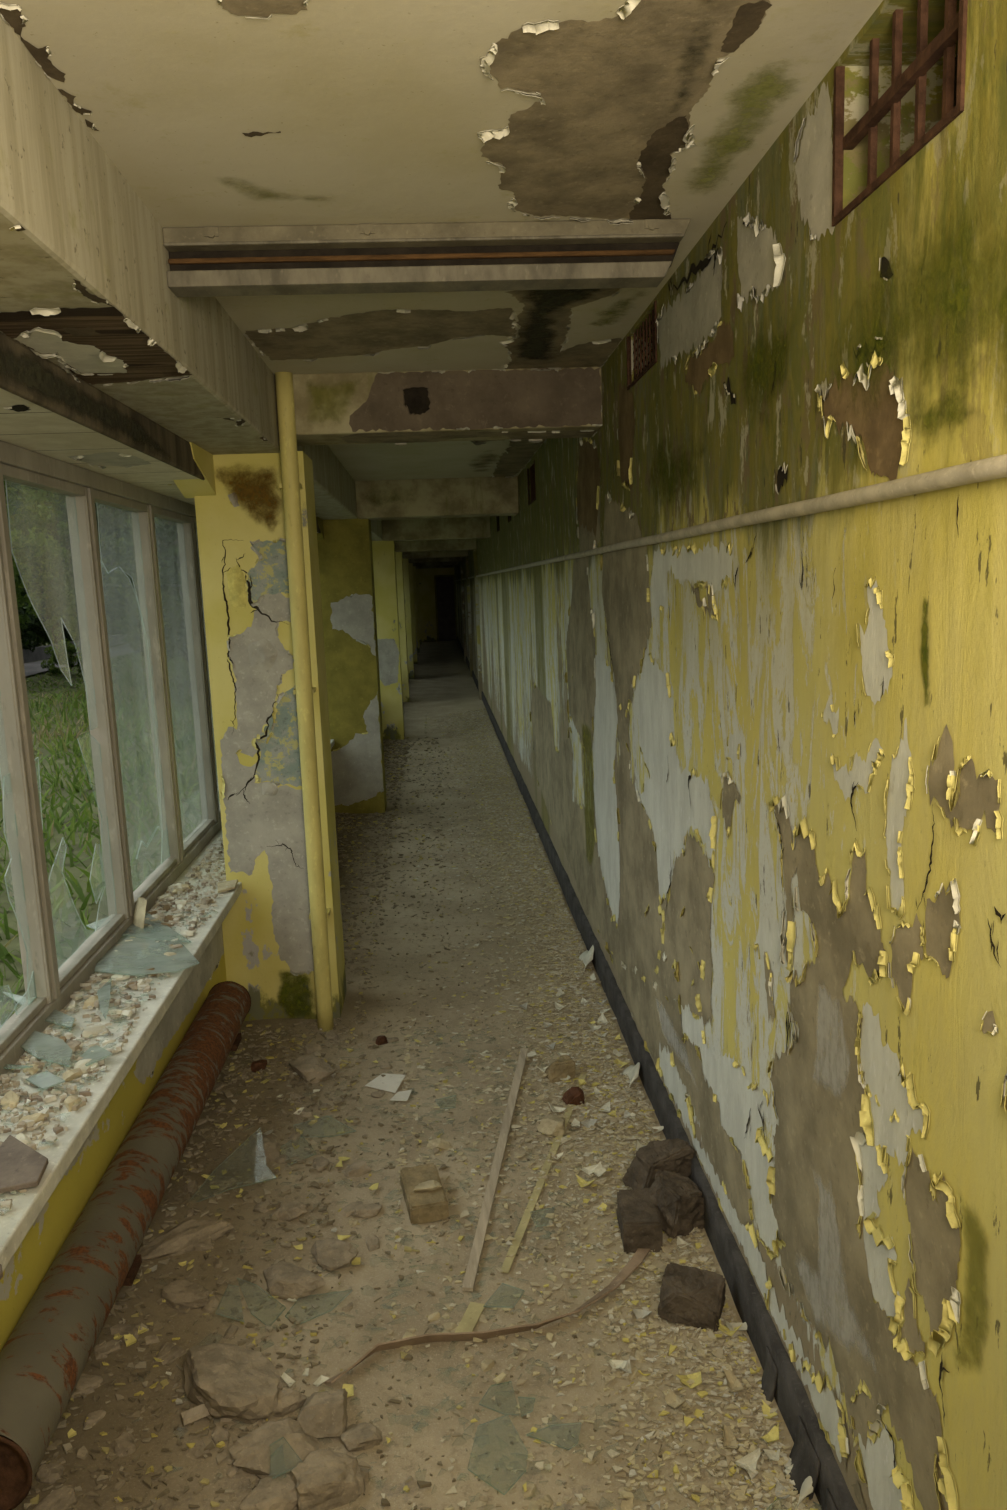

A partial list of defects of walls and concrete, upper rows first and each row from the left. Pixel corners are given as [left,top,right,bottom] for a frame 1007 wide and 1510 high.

peeling [477,0,770,225]
spalling [0,279,192,386]
flaking render [672,212,786,398]
mould [219,470,279,527]
crack [222,539,289,802]
flaking render [220,537,314,976]
flaking render [243,288,1004,1510]